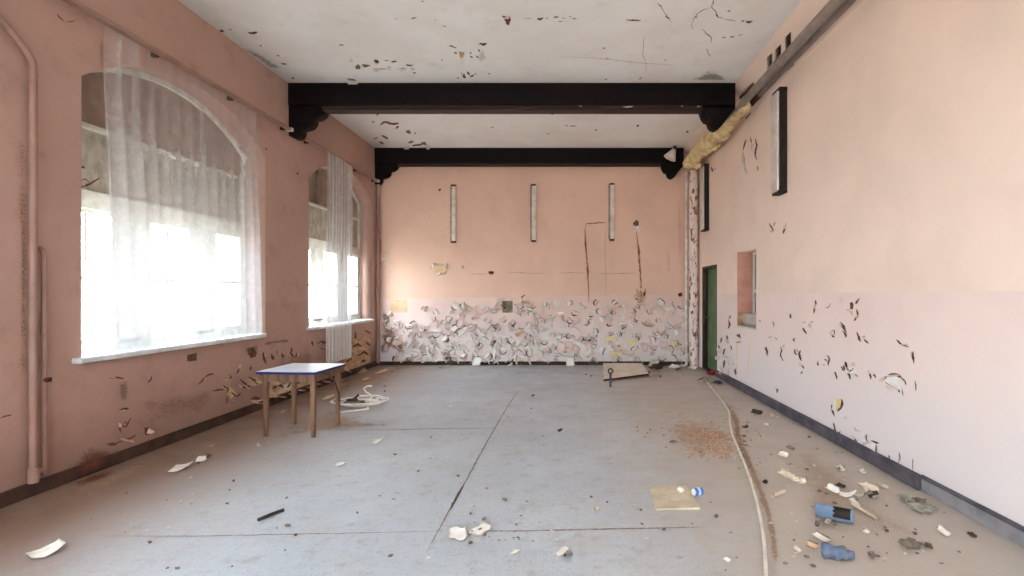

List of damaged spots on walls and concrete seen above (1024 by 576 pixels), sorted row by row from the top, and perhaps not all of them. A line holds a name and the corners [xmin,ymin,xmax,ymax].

crack [657,0,752,57]
peeling [348,59,416,84]
peeling [450,43,490,78]
peeling [371,114,430,149]
peeling [741,137,758,175]
spalling [198,341,331,404]
peeling [344,288,697,372]
peeling [715,313,774,382]
peeling [764,297,869,374]
peeling [817,355,916,394]
peeling [107,408,154,446]
peeling [830,398,913,470]